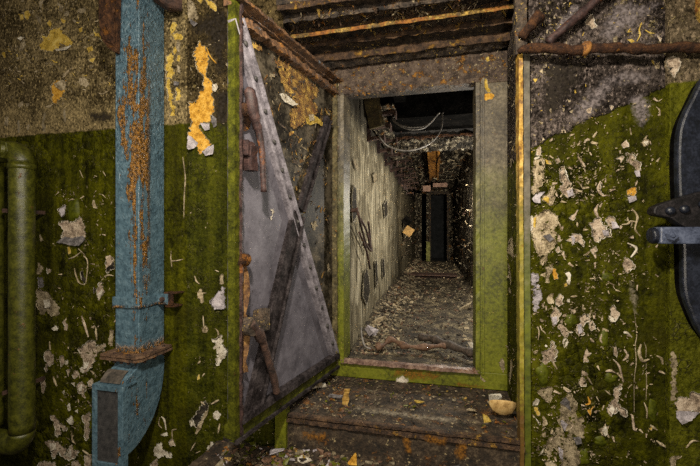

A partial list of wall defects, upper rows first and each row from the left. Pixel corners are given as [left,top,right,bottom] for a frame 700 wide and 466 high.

peeling [164,21,218,156]
peeling [280,93,323,129]
peeling [36,262,69,331]
peeling [56,203,116,301]
peeling [194,270,227,310]
peeling [201,316,228,367]
peeling [530,121,619,387]
peeling [606,303,632,338]
peeling [622,242,638,274]
peeling [37,316,115,466]
peeling [532,383,629,466]
peeling [612,343,700,425]